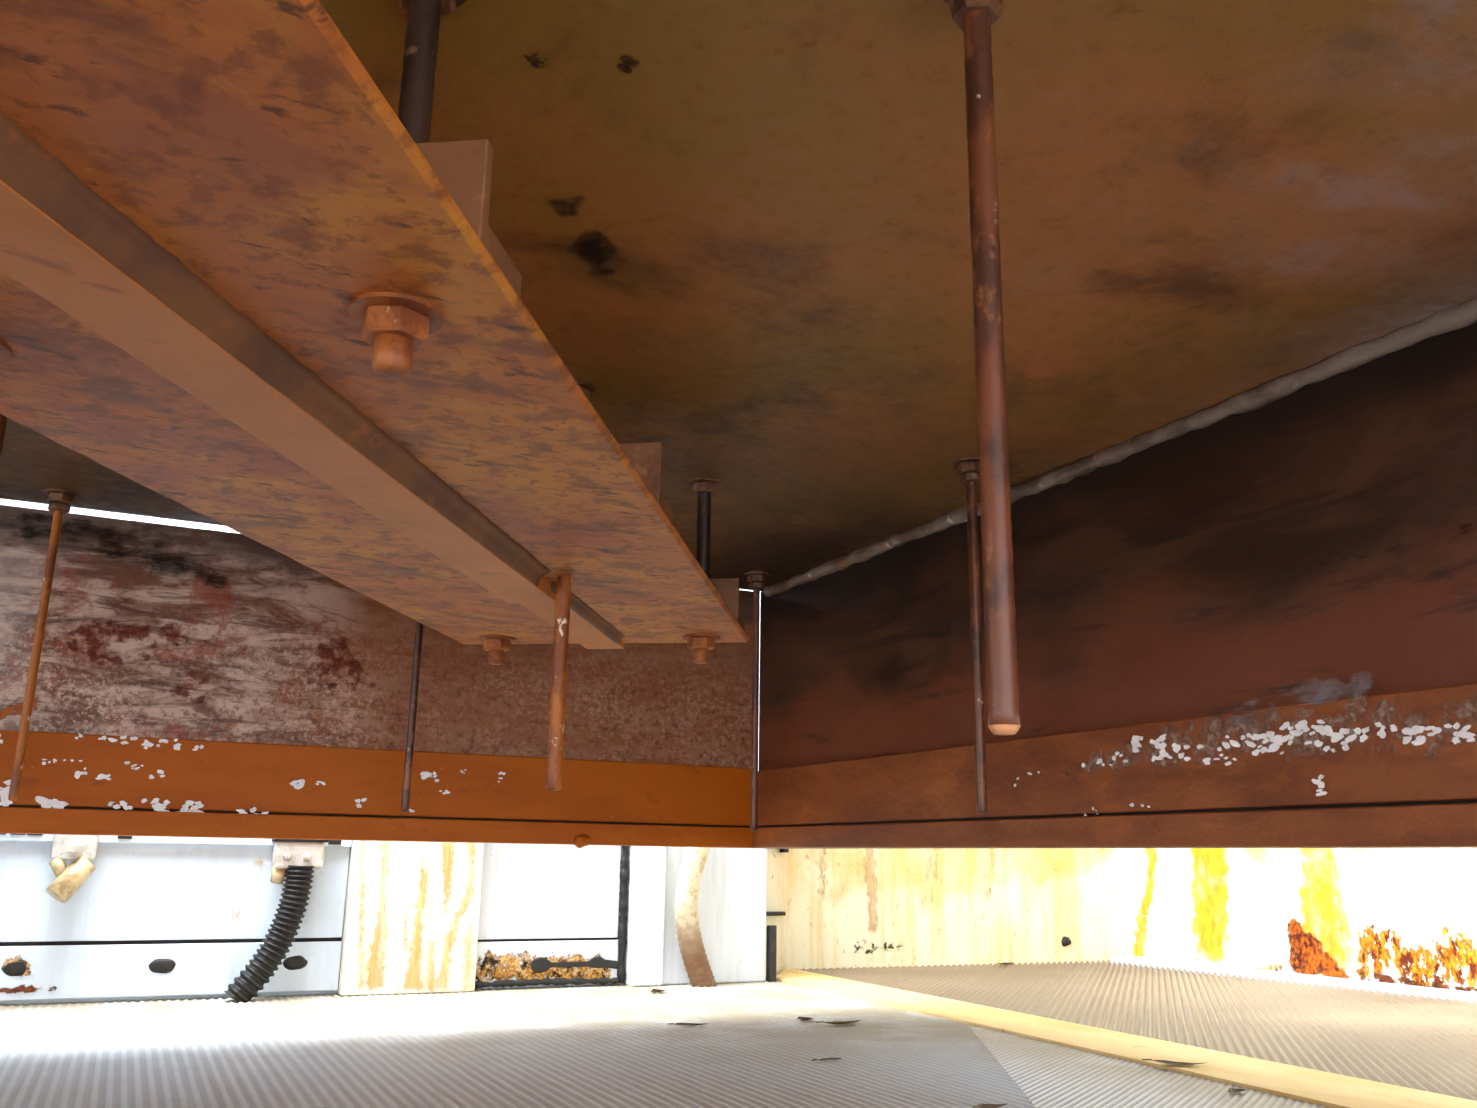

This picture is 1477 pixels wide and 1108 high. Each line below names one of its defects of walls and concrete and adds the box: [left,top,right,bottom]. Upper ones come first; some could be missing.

water stain [0,514,226,588]
peeling [0,780,13,807]
peeling [35,796,69,809]
peeling [42,733,204,780]
peeling [107,798,204,813]
peeling [1067,696,1477,775]
peeling [1312,775,1327,796]
rust [1248,848,1263,859]
rust [404,842,618,991]
rust [1191,848,1230,962]
rust [1258,848,1477,992]
rust [362,925,384,989]